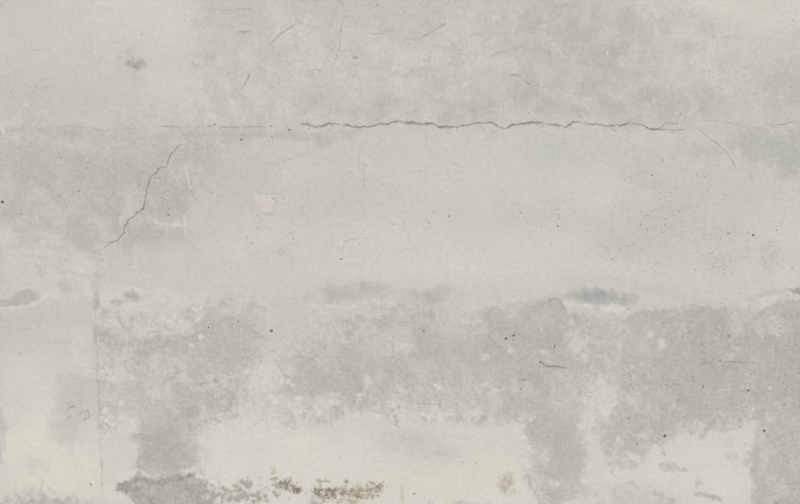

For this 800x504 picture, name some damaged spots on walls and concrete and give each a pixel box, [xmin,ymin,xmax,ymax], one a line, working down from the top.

water stain [0,0,800,296]
crack [95,100,800,252]
water stain [302,272,463,312]
peeling [65,286,800,504]